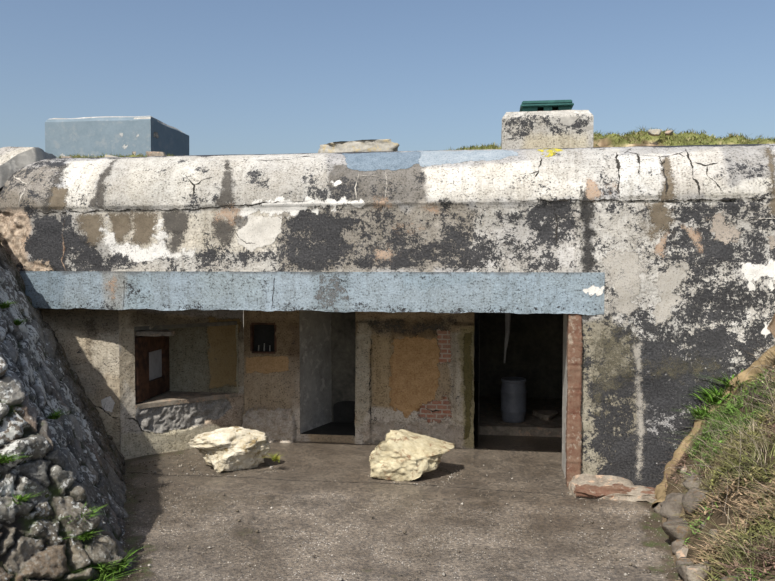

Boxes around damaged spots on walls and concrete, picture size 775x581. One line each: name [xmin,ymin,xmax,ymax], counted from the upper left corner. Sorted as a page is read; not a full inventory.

crack [1,176,303,268]
leakage [579,189,597,272]
crack [519,148,772,244]
leakage [643,157,676,241]
peeling [740,235,775,291]
spalling [761,314,775,338]
peeling [360,329,466,449]
leakage [590,328,720,475]